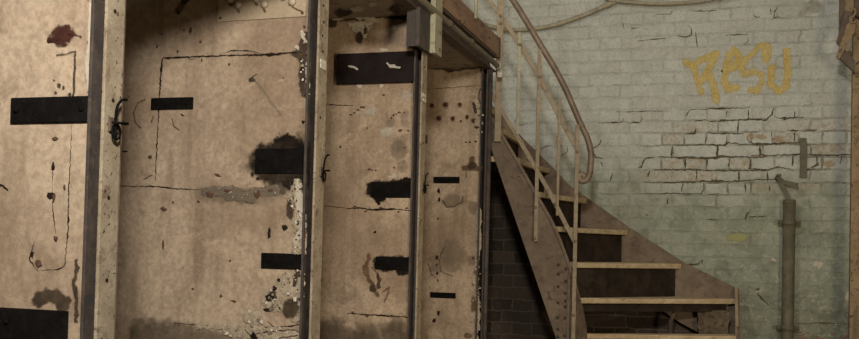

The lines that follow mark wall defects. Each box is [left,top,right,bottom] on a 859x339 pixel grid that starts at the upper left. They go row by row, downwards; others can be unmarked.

peeling [332,0,379,44]
spalling [197,173,307,255]
peeling [195,268,306,339]
water stain [320,320,405,339]